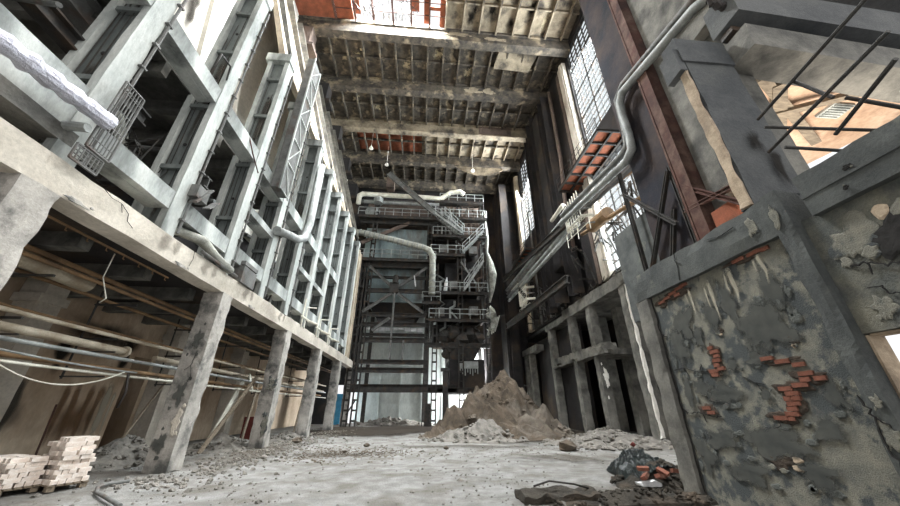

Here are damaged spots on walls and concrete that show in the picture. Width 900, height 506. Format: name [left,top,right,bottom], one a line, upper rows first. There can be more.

peeling [828,197,900,268]
flaking render [722,245,770,269]
damp [704,283,719,314]
damp [724,271,739,298]
peeling [870,295,900,321]
peeling [654,269,847,443]